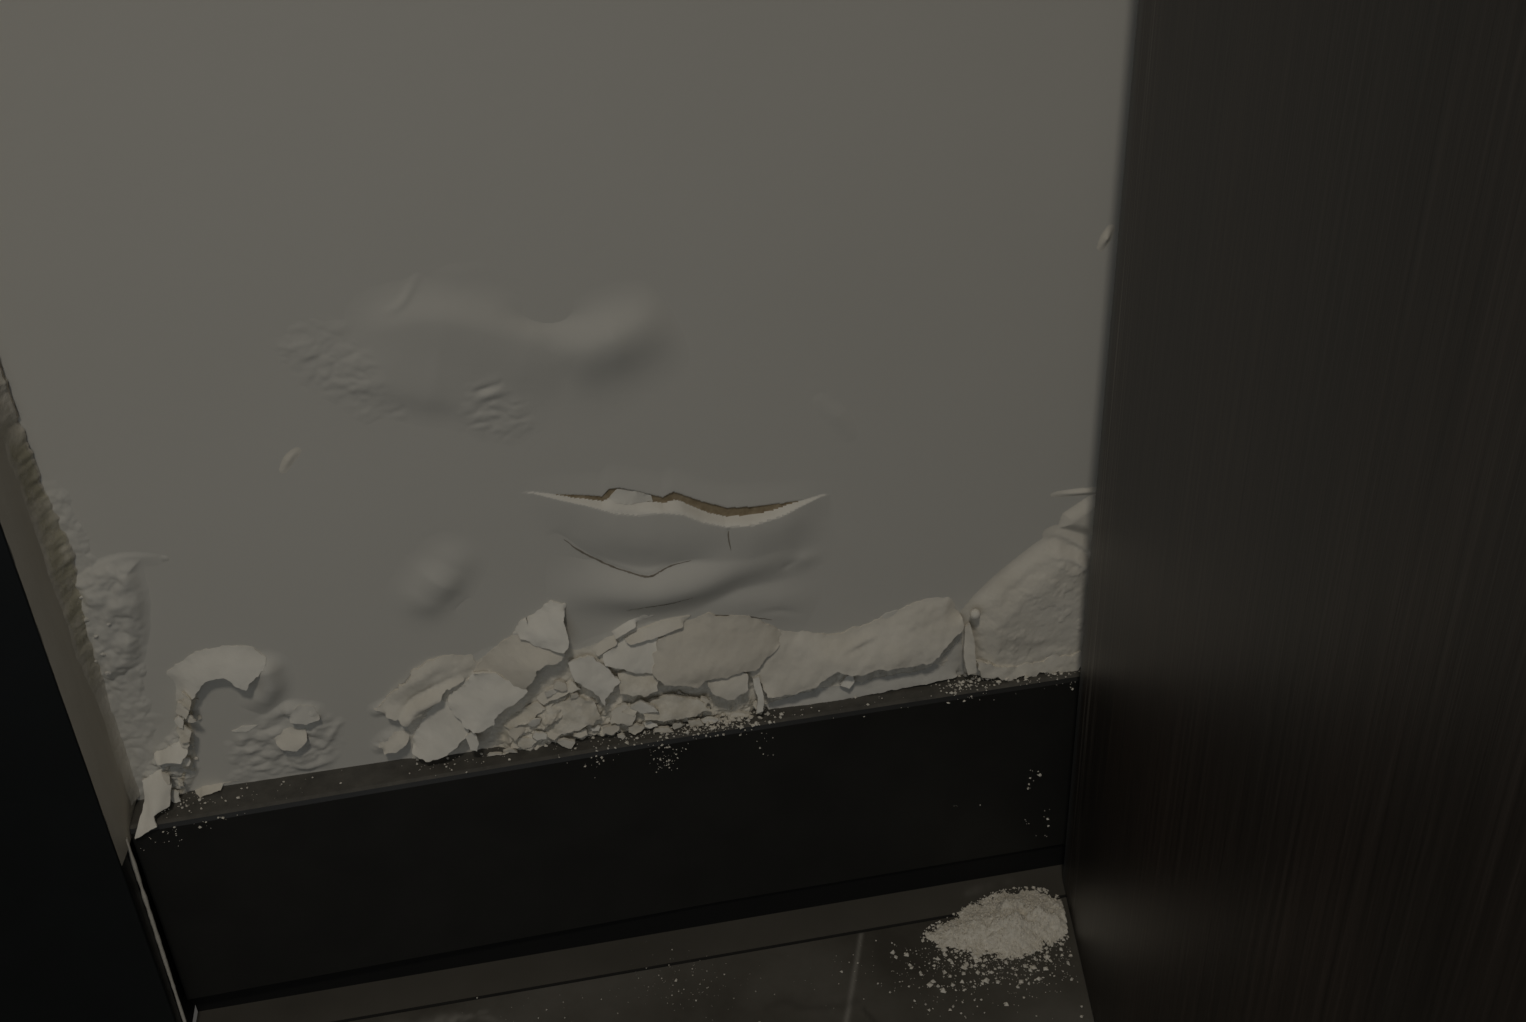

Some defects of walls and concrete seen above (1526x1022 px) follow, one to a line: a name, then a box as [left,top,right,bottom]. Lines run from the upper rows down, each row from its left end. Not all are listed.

peeling [41,479,98,575]
crack [518,463,830,549]
peeling [104,645,320,839]
flaking render [366,597,981,762]